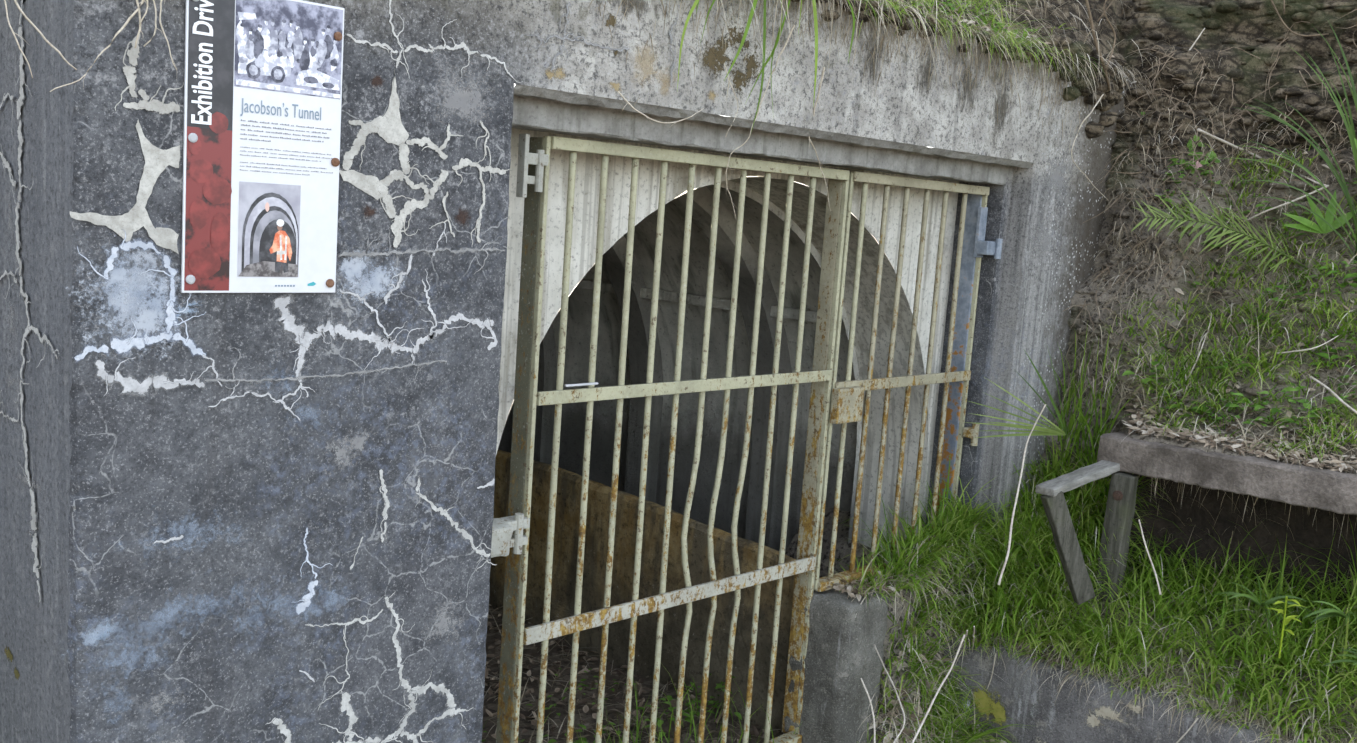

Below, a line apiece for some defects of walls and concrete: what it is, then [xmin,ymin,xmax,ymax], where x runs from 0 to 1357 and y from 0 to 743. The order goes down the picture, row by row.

spalling [70,35,184,254]
spalling [339,69,512,248]
crack [0,0,505,603]
crack [265,469,497,743]